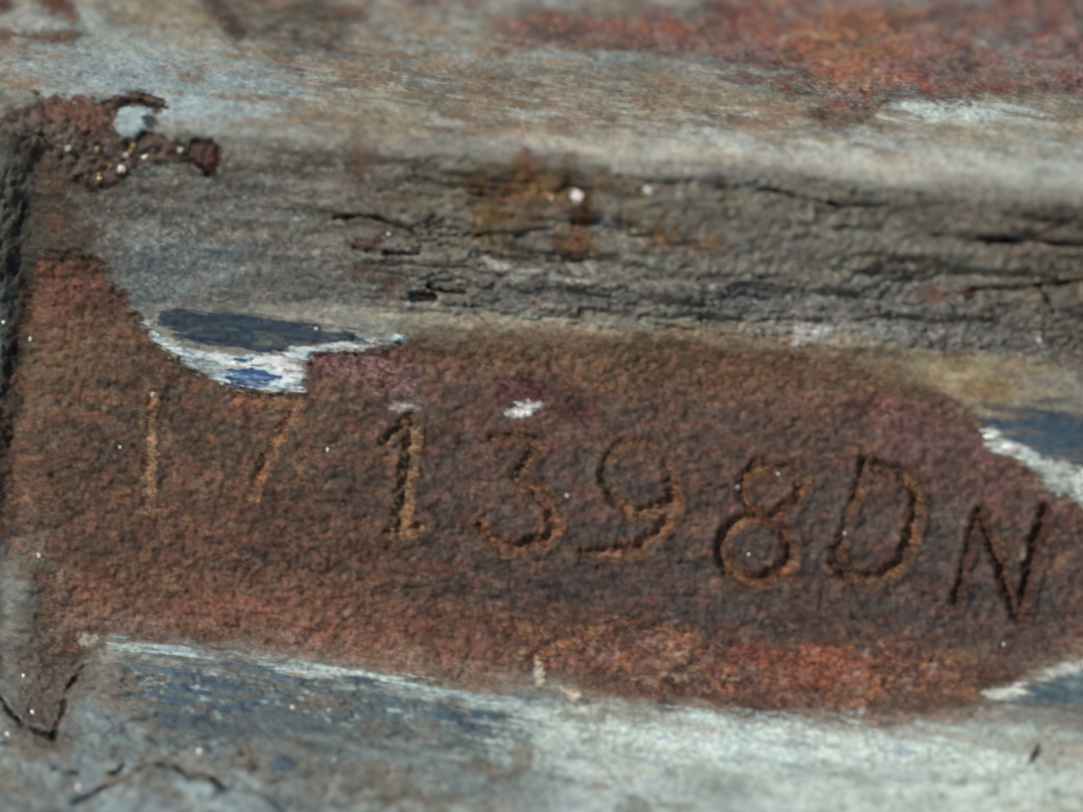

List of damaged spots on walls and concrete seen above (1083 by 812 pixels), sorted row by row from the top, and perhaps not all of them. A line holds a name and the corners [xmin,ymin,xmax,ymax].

rust [493,0,1083,133]
peeling [144,309,404,393]
rust [0,250,1083,726]
peeling [980,399,1083,507]
crack [0,667,83,742]